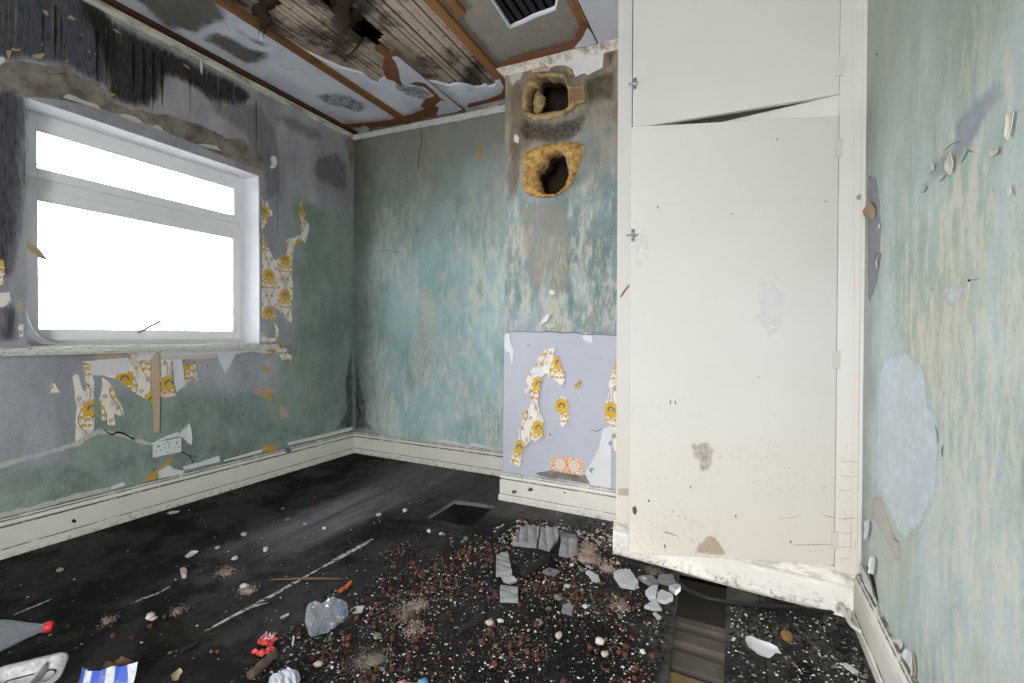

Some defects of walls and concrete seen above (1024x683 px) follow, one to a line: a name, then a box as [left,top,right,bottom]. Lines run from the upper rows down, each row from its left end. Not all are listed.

damp [42,5,62,50]
flaking render [0,43,277,171]
damp [83,0,271,148]
damp [322,95,363,110]
damp [510,87,583,194]
spalling [509,72,586,121]
spalling [514,134,586,198]
damp [586,74,613,101]
flaking render [856,179,881,299]
peeling [143,448,265,482]
flaking render [394,314,617,494]
flaking render [876,351,943,543]